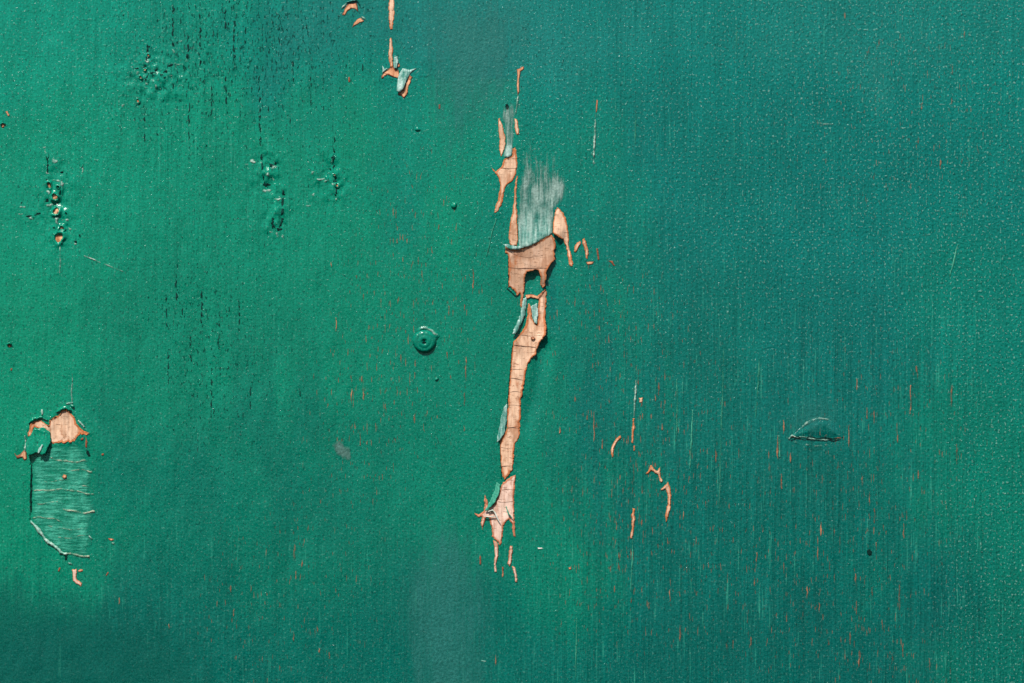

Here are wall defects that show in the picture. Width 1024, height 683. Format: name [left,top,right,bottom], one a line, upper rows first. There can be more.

peeling [342,0,365,27]
peeling [381,0,415,98]
peeling [475,111,615,582]
peeling [14,402,104,586]
peeling [646,465,671,522]